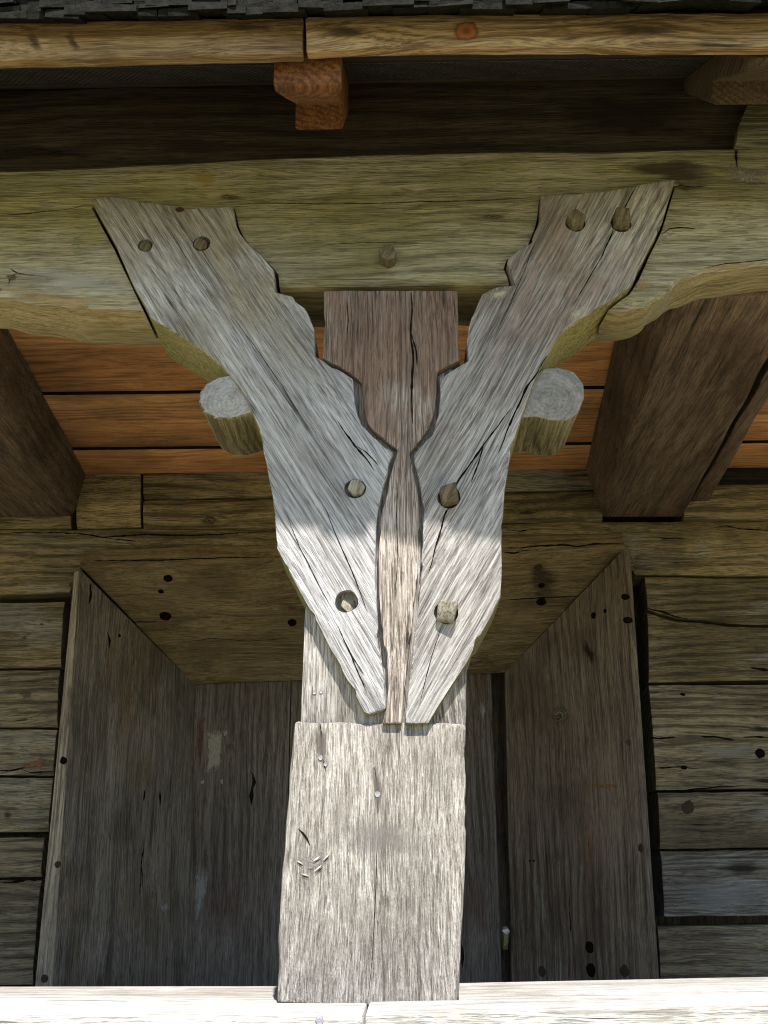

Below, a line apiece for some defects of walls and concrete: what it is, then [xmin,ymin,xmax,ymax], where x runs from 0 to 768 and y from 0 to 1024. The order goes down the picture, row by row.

crack [410,293,418,424]
crack [338,422,377,470]